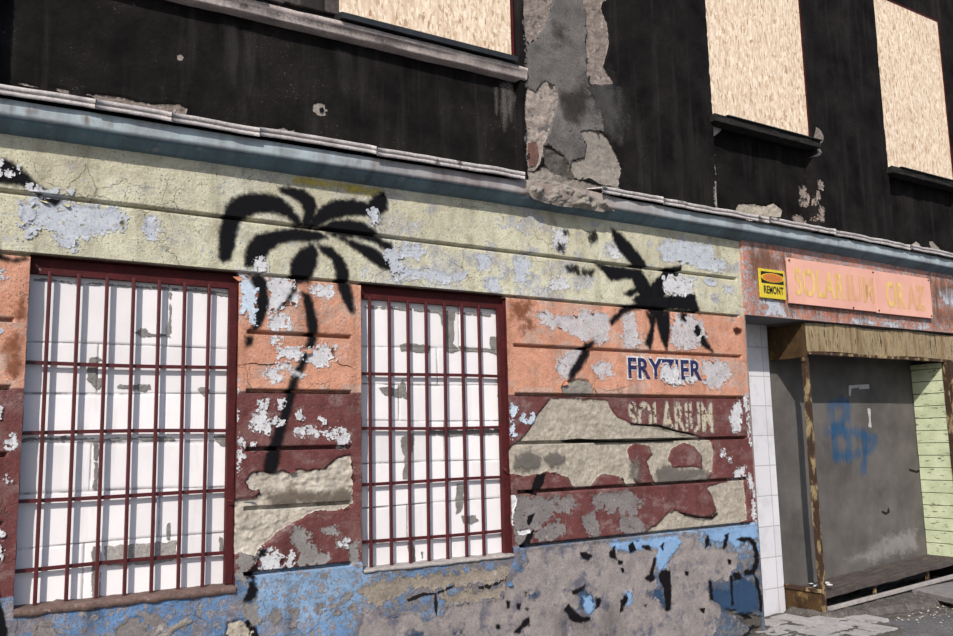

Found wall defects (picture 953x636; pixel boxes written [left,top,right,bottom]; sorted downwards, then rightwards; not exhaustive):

spalling [523,0,553,45]
spalling [582,0,613,85]
spalling [524,82,623,196]
peeling [0,157,130,253]
spalling [735,180,825,223]
peeling [382,240,502,293]
peeling [656,238,734,297]
peeling [234,256,338,385]
peeling [3,432,18,451]
spalling [502,300,757,540]
spalling [225,397,355,575]
spalling [225,620,254,636]